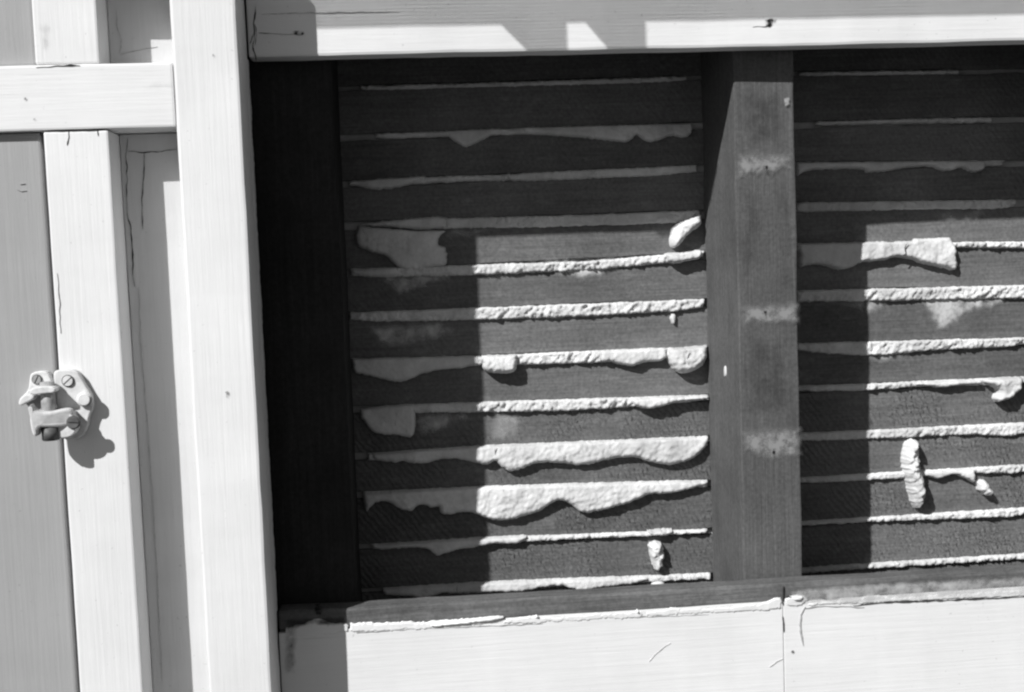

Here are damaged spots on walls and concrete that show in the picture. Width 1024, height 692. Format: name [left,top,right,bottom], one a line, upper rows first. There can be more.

crack [126,139,176,665]
crack [782,585,1011,646]